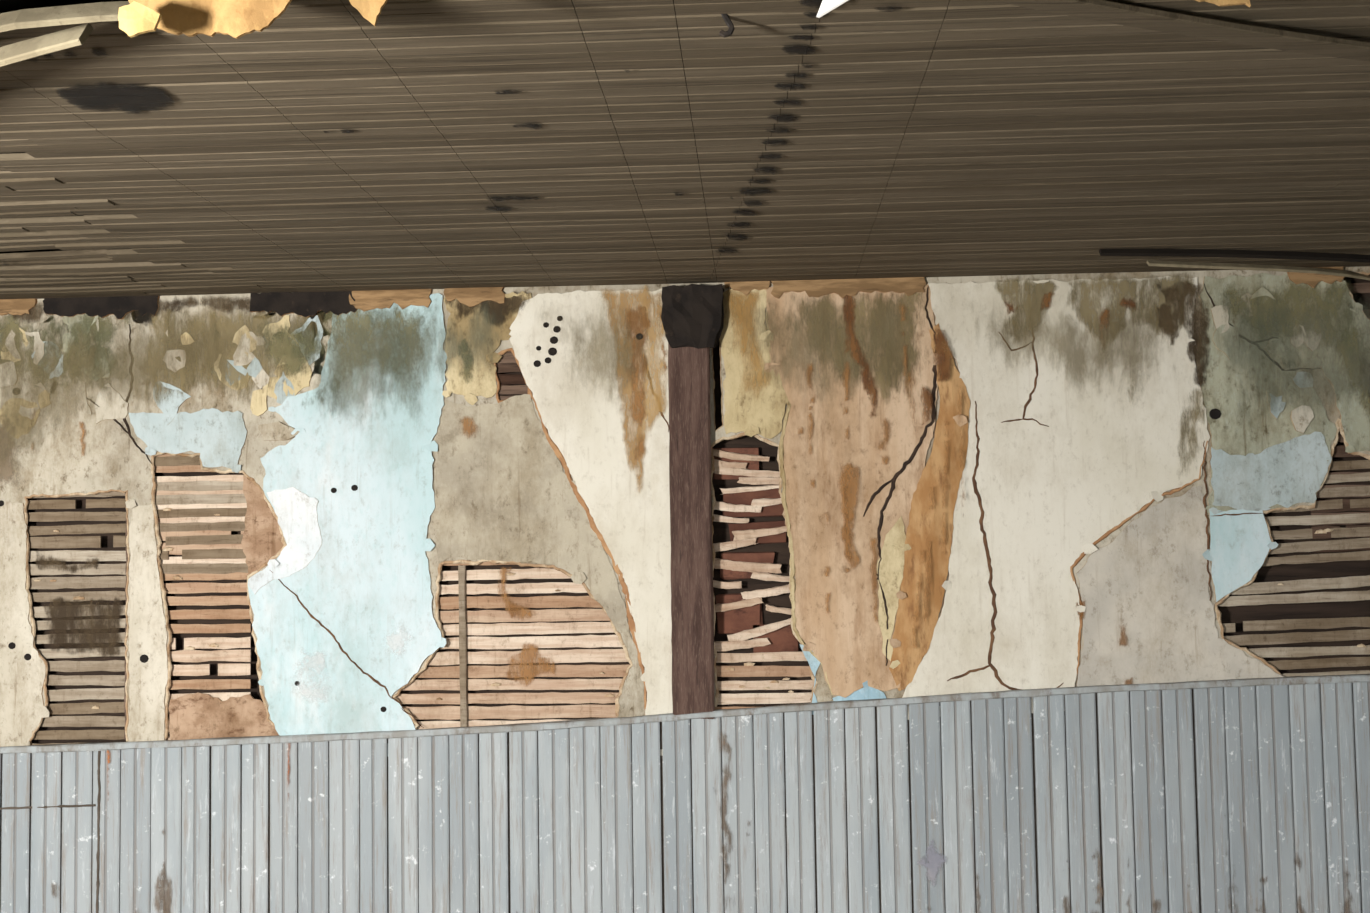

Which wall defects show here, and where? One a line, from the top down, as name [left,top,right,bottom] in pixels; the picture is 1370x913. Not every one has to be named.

leakage [57,83,174,114]
leakage [0,308,425,482]
peeling [0,288,673,757]
crack [863,286,937,666]
crack [947,328,1049,690]
peeling [711,271,1370,720]
leakage [997,274,1209,460]
leakage [1226,283,1370,411]